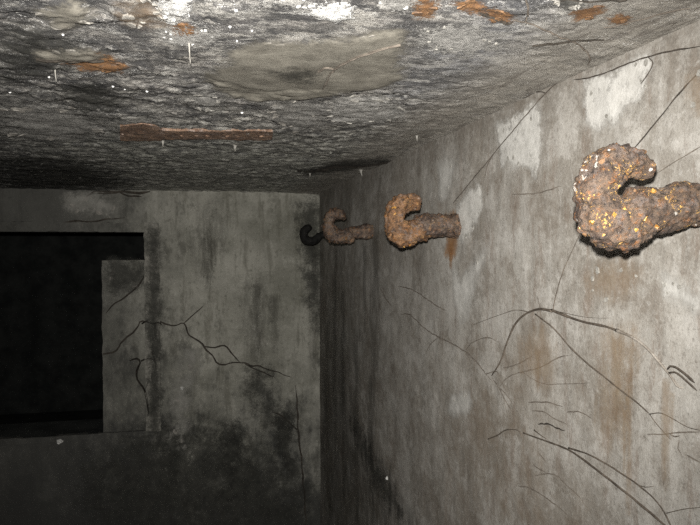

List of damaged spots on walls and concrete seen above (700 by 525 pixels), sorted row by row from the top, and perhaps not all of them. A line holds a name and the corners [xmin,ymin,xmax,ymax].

rust [412,0,439,19]
rust [456,0,514,23]
rust [569,5,631,25]
rust [67,53,127,75]
crack [635,75,696,147]
rust [120,123,273,141]
crack [453,83,560,203]
crack [656,147,700,174]
rust [445,237,457,261]
crack [103,306,307,525]
crack [647,431,700,462]
crack [519,453,585,516]